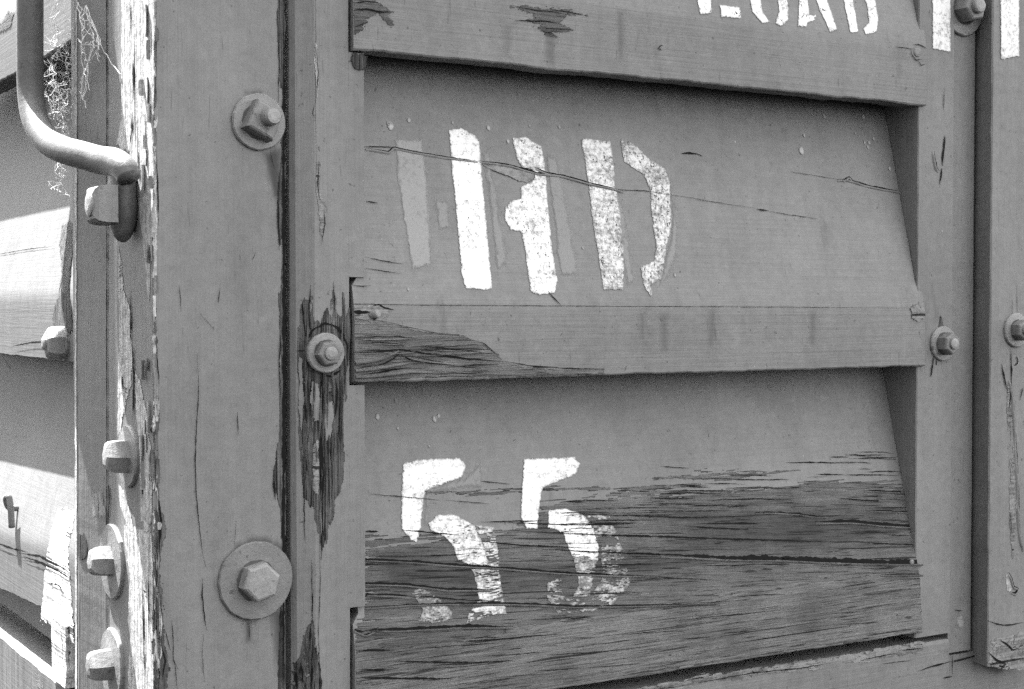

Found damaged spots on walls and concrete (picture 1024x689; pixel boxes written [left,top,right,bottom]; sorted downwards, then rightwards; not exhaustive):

peeling [510,5,588,37]
crack [366,146,817,219]
crack [801,173,900,194]
peeling [270,0,334,553]
crack [355,257,403,305]
peeling [353,303,393,322]
peeling [116,0,162,689]
peeling [278,602,286,689]
peeling [641,641,925,689]